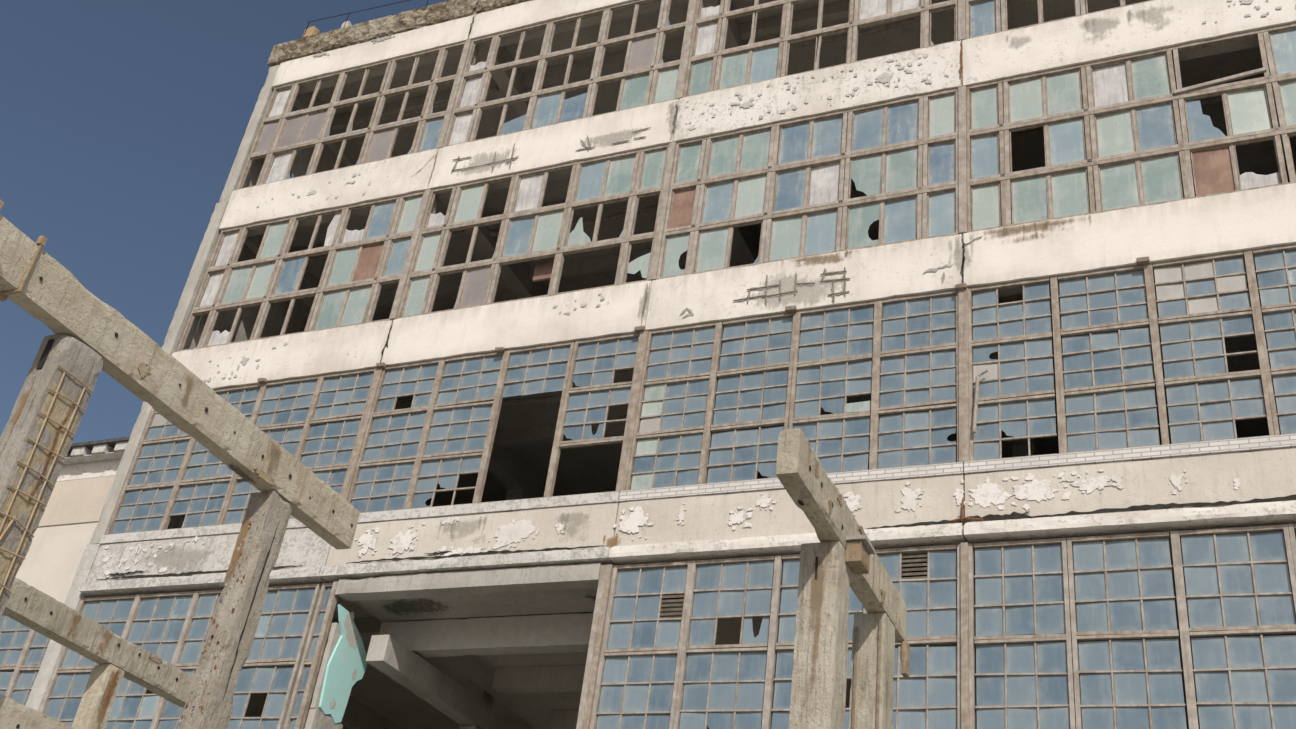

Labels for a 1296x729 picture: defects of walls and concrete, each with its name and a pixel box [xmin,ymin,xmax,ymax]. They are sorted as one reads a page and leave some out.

spalling [451,143,519,173]
spalling [733,267,850,305]
spalling [828,470,1296,535]
spalling [346,519,600,564]